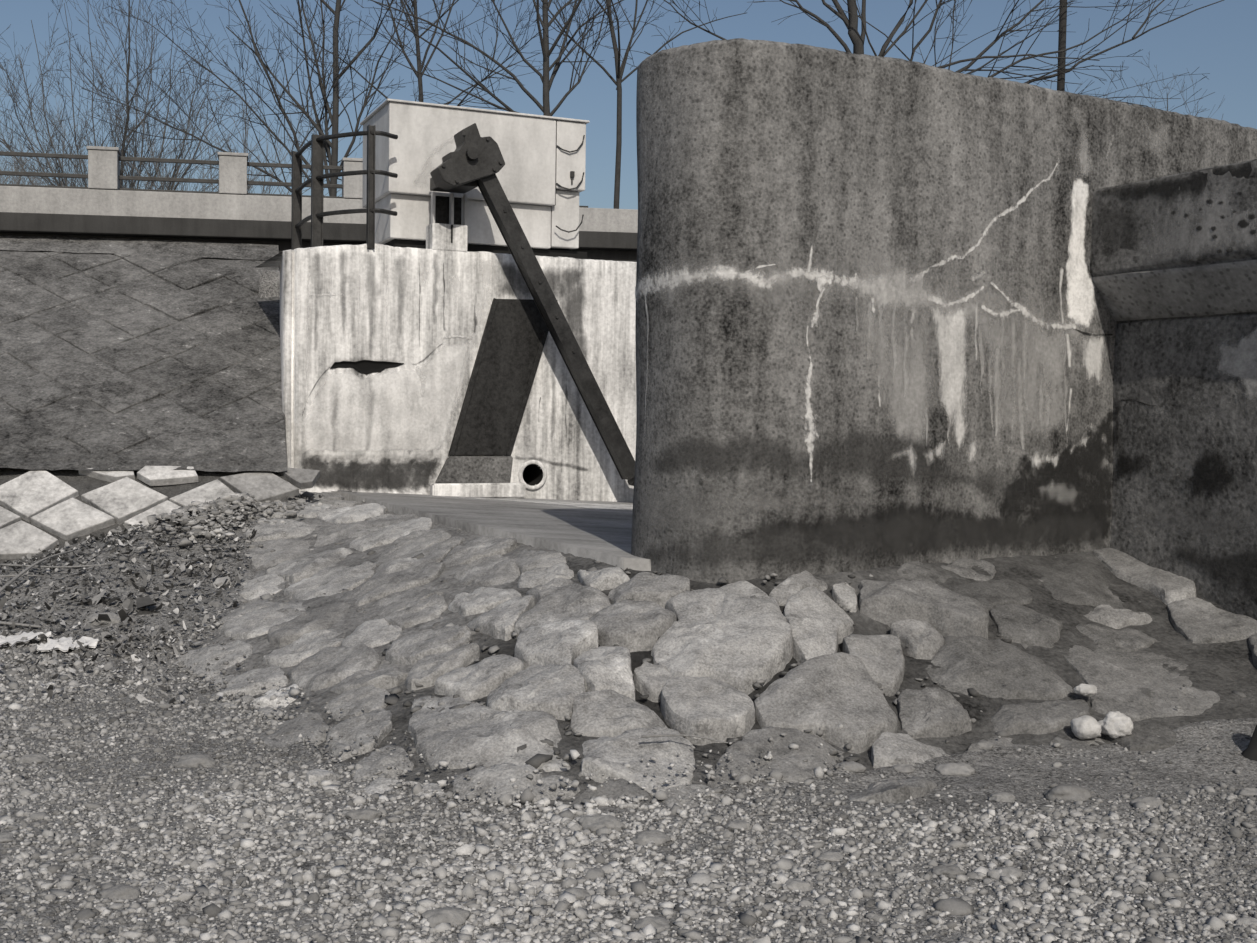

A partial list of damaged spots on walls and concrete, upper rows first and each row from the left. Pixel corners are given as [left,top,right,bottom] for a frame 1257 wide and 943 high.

crack [635,163,1113,339]
water stain [658,139,1257,482]
crack [302,355,429,415]
flaking render [1218,329,1257,399]
water stain [1180,453,1232,497]
water stain [701,502,1102,565]